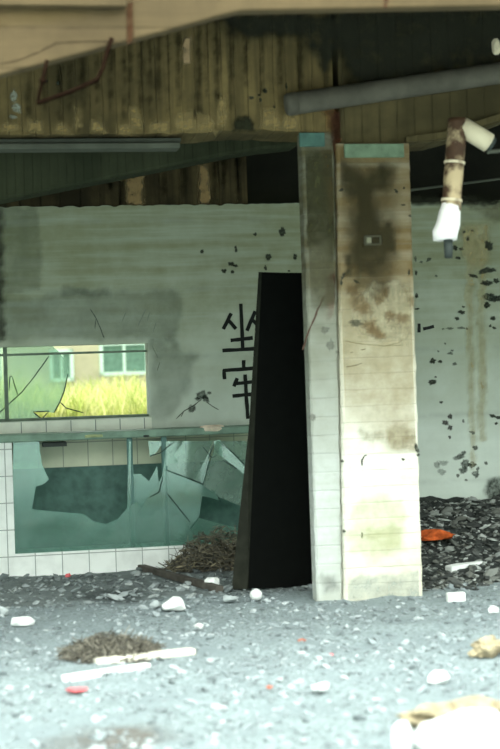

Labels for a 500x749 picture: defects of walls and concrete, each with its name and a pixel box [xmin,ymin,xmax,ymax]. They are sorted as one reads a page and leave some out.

water stain [342,165,394,275]
peeling [469,267,500,308]
peeling [456,446,488,481]